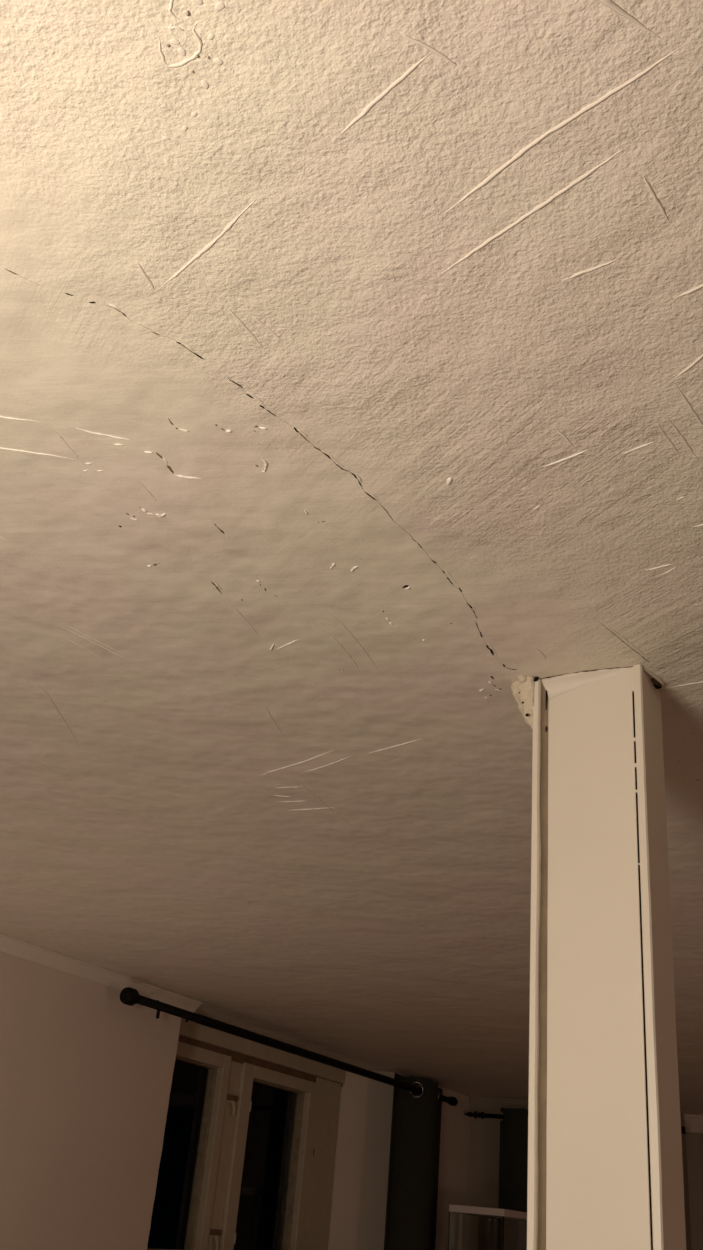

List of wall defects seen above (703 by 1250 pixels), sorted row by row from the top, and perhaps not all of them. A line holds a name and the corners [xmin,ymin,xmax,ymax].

crack [5,268,203,359]
crack [228,376,649,679]